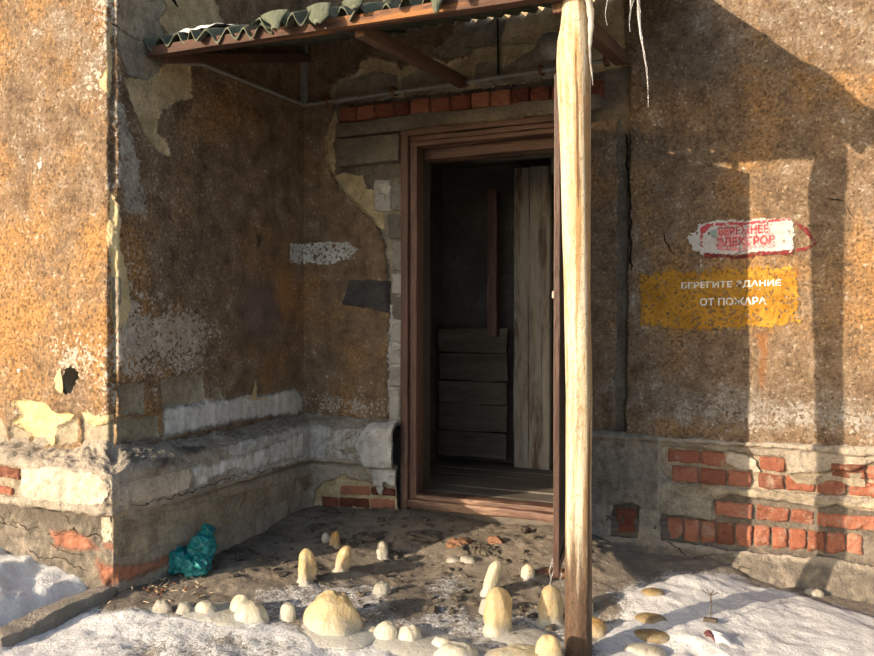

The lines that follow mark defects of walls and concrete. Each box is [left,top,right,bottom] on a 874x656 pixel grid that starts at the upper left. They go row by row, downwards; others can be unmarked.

spalling [593,0,627,50]
spalling [99,0,223,156]
spalling [106,195,132,330]
flaking render [325,7,561,426]
flaking render [591,47,631,432]
spalling [54,356,85,393]
peeling [0,381,303,446]
flaking render [0,464,21,497]
crack [0,514,102,572]
peeling [101,516,112,542]
flaking render [314,475,398,510]
flaking render [660,445,874,567]